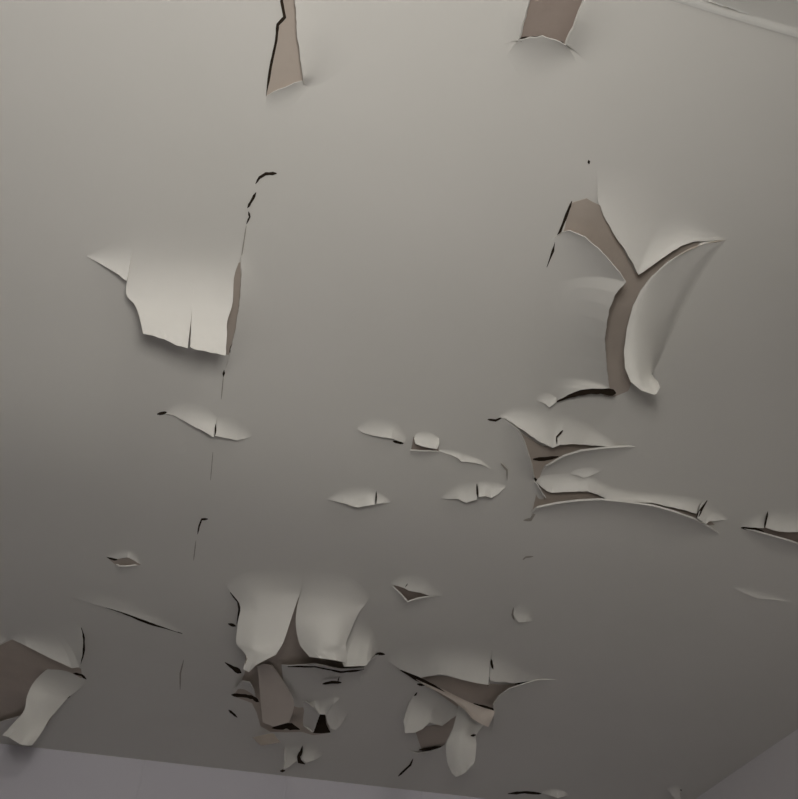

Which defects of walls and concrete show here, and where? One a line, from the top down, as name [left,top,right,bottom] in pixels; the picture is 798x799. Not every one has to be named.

peeling [265,0,374,112]
peeling [502,0,639,81]
crack [242,172,277,253]
peeling [87,229,273,399]
peeling [357,160,728,543]
peeling [157,402,252,441]
crack [193,518,208,560]
peeling [327,486,391,507]
peeling [740,509,798,565]
peeling [0,623,87,746]
peeling [225,570,560,777]